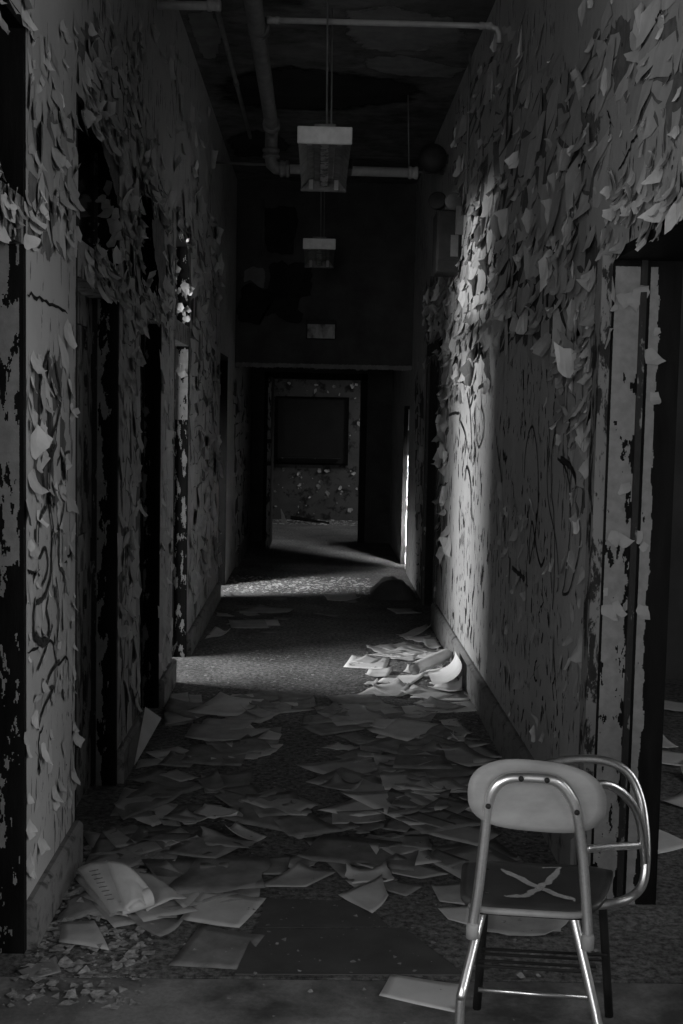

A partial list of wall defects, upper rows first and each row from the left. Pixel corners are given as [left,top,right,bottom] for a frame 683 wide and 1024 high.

peeling [12,819,51,885]
peeling [0,0,251,848]
peeling [235,0,683,905]